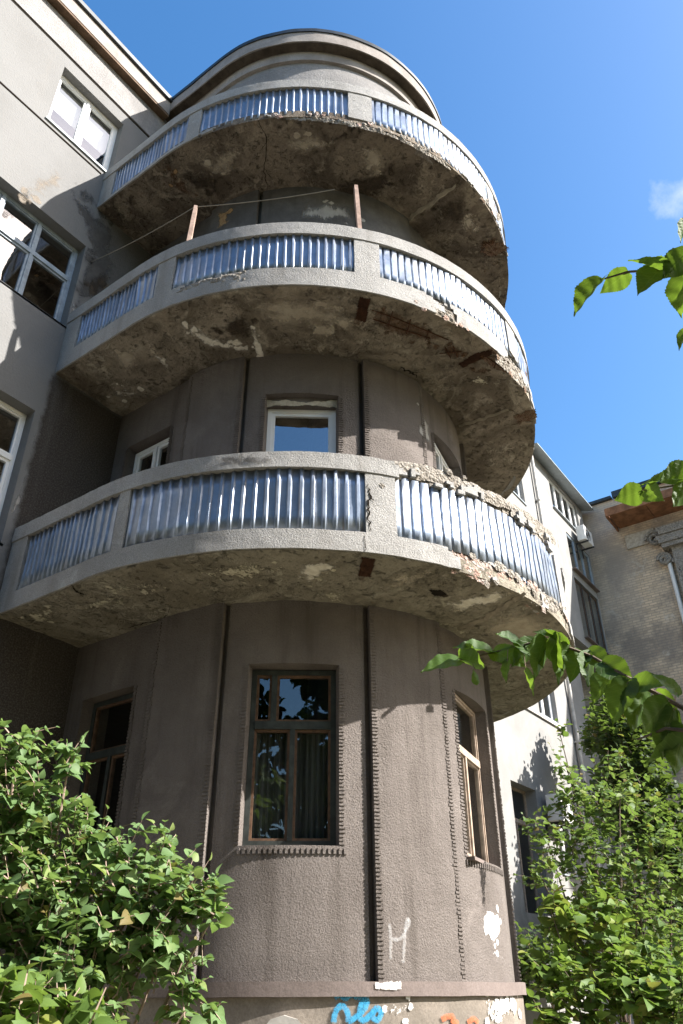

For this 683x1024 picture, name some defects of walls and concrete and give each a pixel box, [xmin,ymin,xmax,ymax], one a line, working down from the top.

spalling [272,112,451,170]
spalling [480,242,509,257]
rust [355,297,370,323]
spalling [379,460,559,548]
peeling [300,563,344,603]
rust [358,557,376,577]
spalling [448,550,568,622]